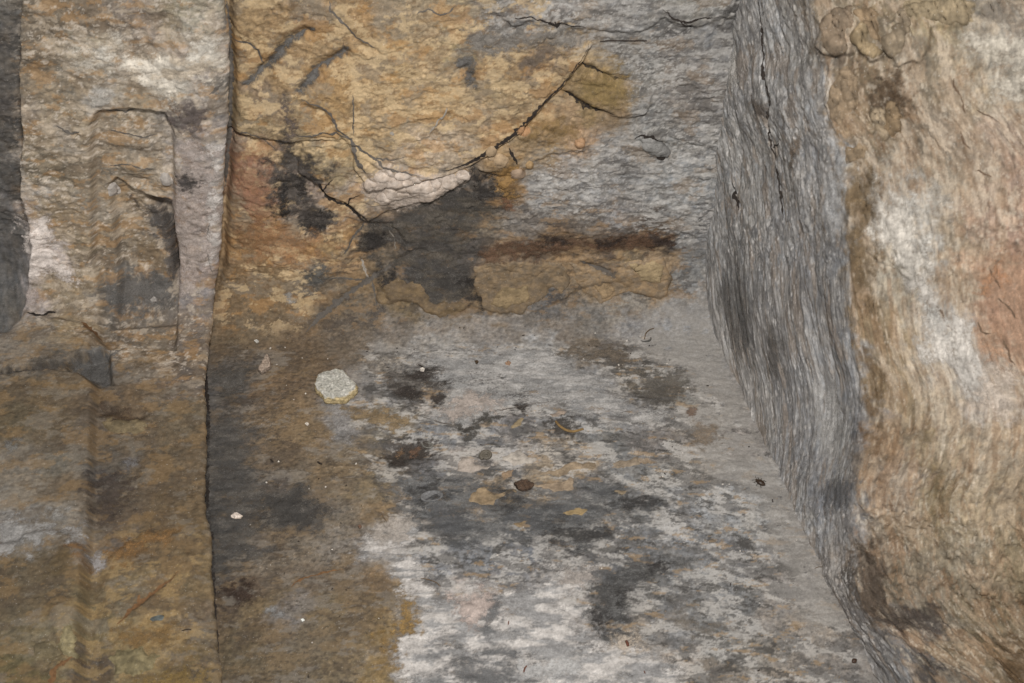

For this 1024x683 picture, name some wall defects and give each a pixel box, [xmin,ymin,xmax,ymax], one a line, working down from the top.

crack [209,1,275,186]
crack [446,16,626,171]
crack [663,10,718,27]
crack [758,0,784,218]
leakage [275,173,333,235]
crack [299,98,417,332]
leakage [361,169,496,211]
leakage [340,340,717,445]
leakage [358,439,695,683]